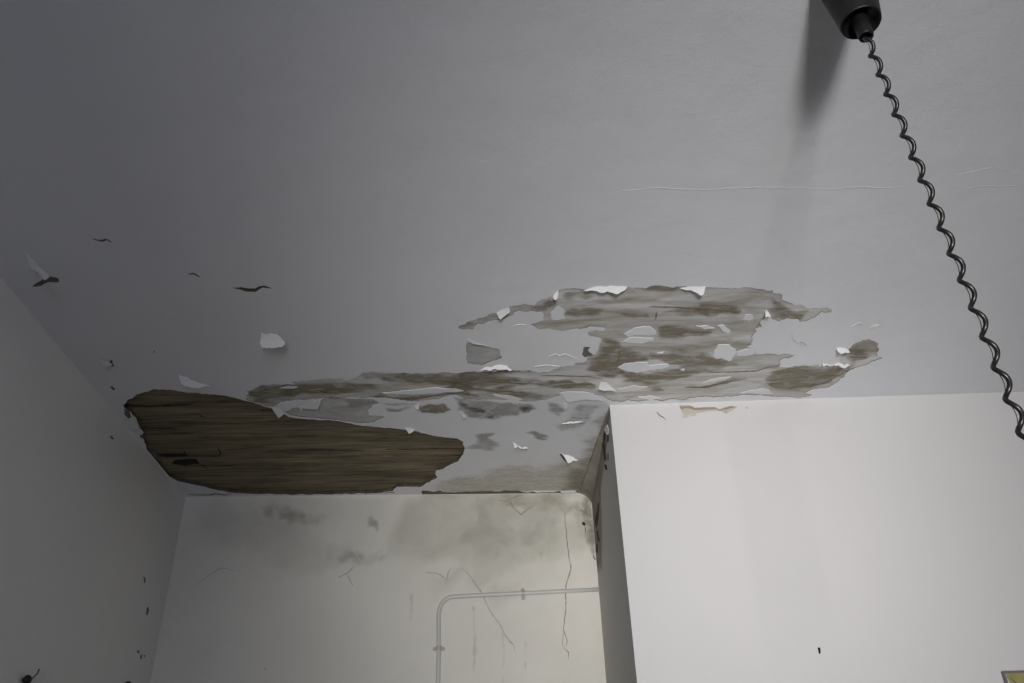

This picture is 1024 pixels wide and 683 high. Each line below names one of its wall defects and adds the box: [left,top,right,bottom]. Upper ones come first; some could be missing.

peeling [24,251,60,287]
damp [466,402,518,418]
peeling [123,285,882,495]
damp [445,424,609,495]
crack [422,490,600,659]